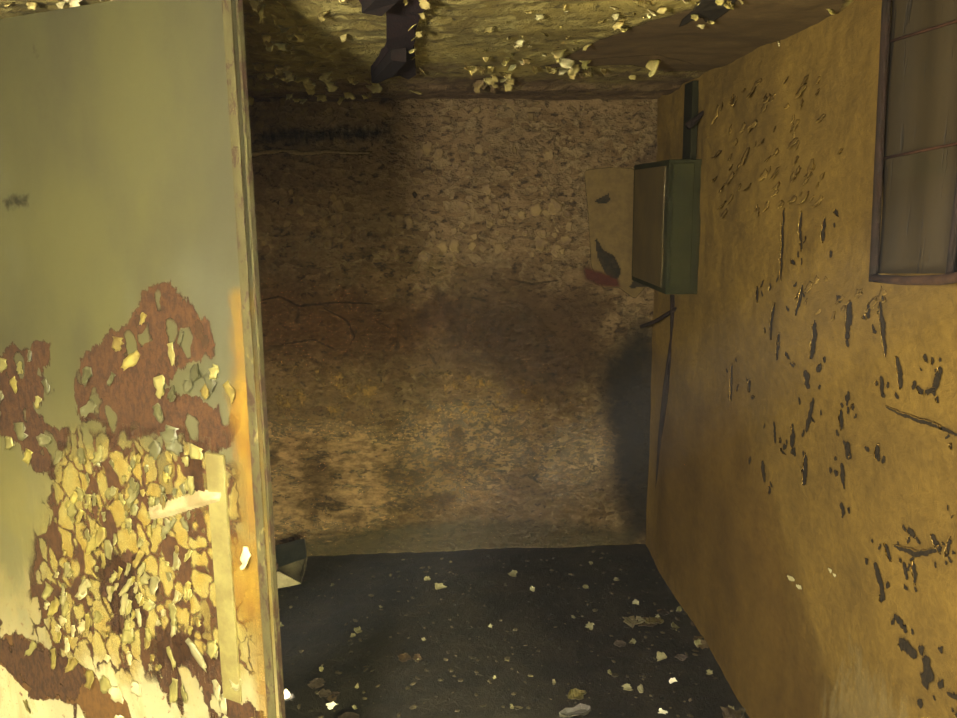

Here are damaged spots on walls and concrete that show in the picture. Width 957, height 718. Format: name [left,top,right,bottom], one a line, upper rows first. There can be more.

peeling [3,1,38,10]
peeling [56,0,82,9]
peeling [243,0,397,112]
peeling [403,0,431,54]
rust [0,340,71,480]
peeling [29,429,253,681]
rust [74,281,268,718]
rust [0,619,142,718]